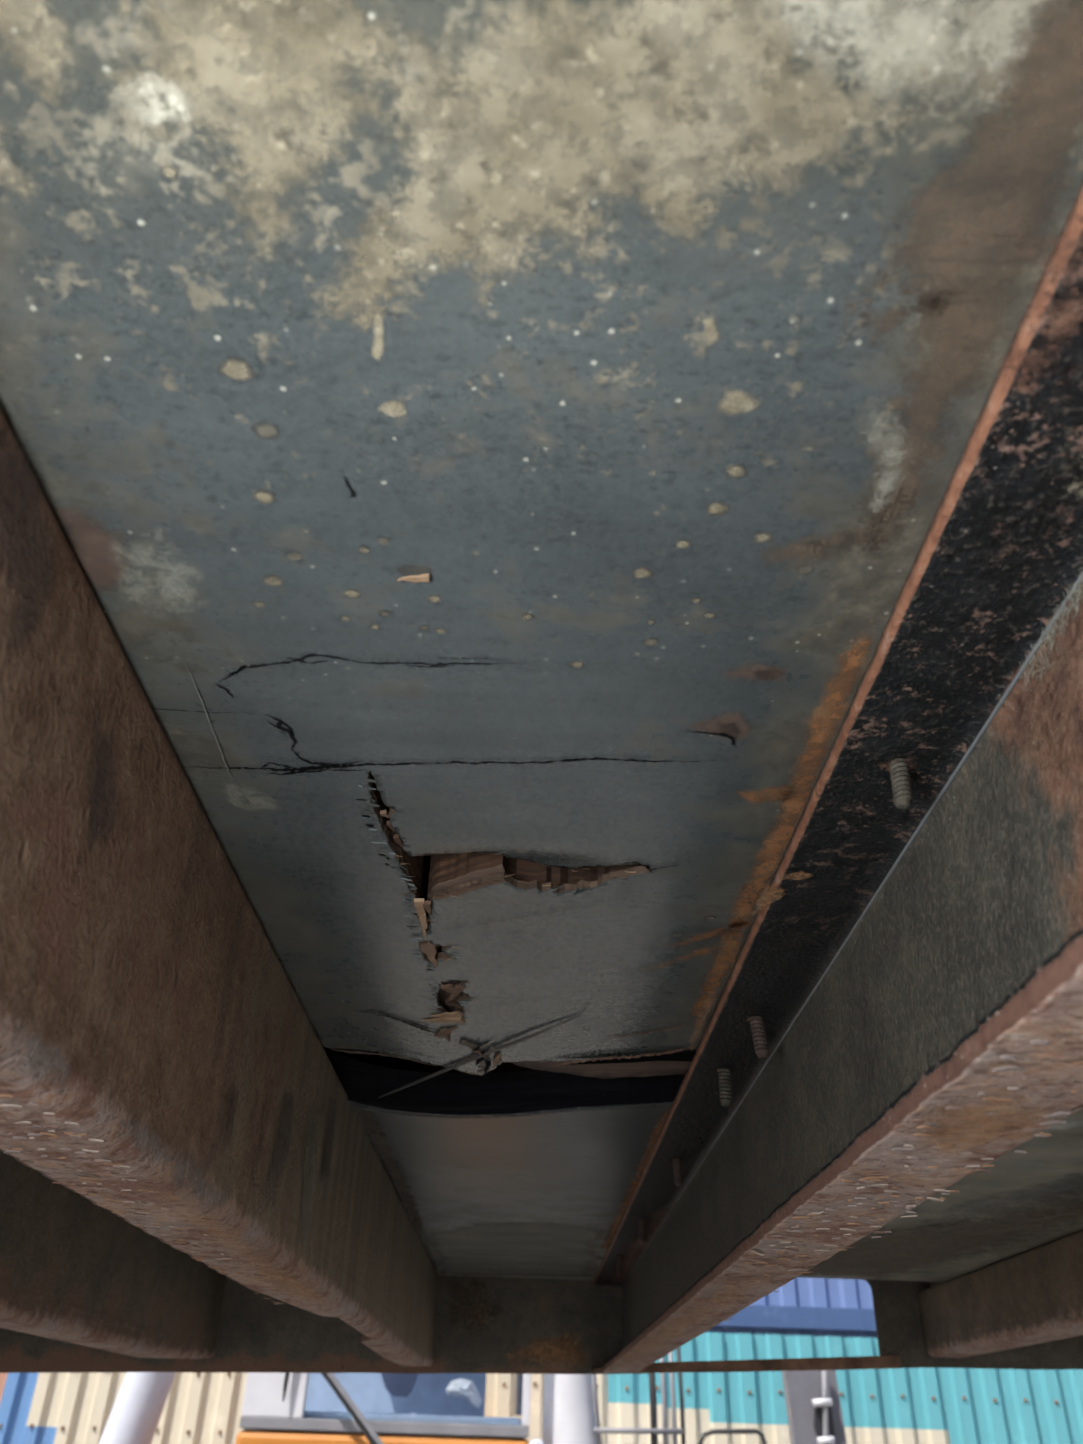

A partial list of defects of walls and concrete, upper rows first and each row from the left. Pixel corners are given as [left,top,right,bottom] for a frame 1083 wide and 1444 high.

leakage [703,318,718,345]
leakage [754,1,1083,574]
crack [152,654,728,775]
corrosion [649,639,872,1051]
crack [335,1010,438,1067]
crack [552,1048,696,1066]